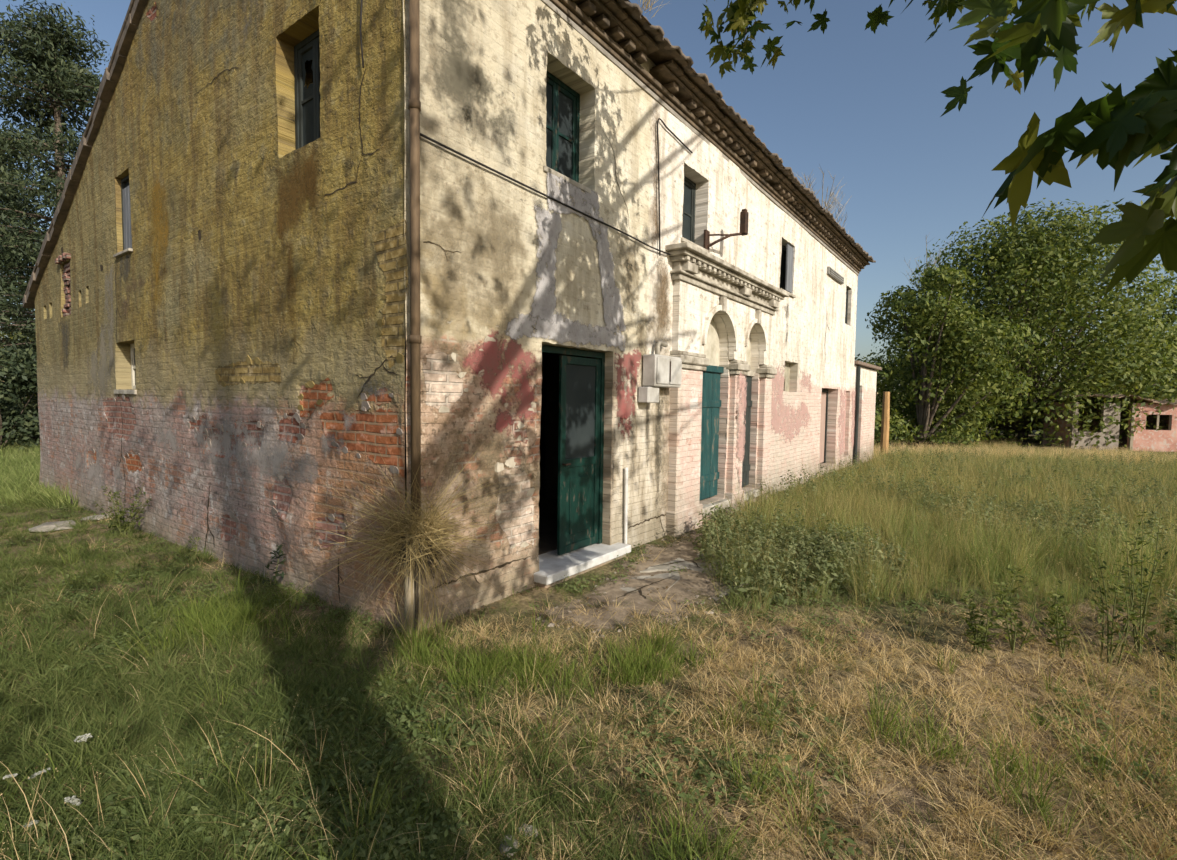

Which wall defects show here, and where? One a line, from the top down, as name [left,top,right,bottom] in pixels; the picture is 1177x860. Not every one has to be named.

leakage [435,0,514,137]
crack [326,69,379,195]
spalling [372,219,408,368]
spalling [103,394,143,472]
spalling [187,412,264,459]
flaking render [215,355,281,387]
spalling [278,377,404,477]
crack [357,355,397,397]
peeling [423,331,537,548]
peeling [614,349,642,436]
spalling [315,512,347,548]